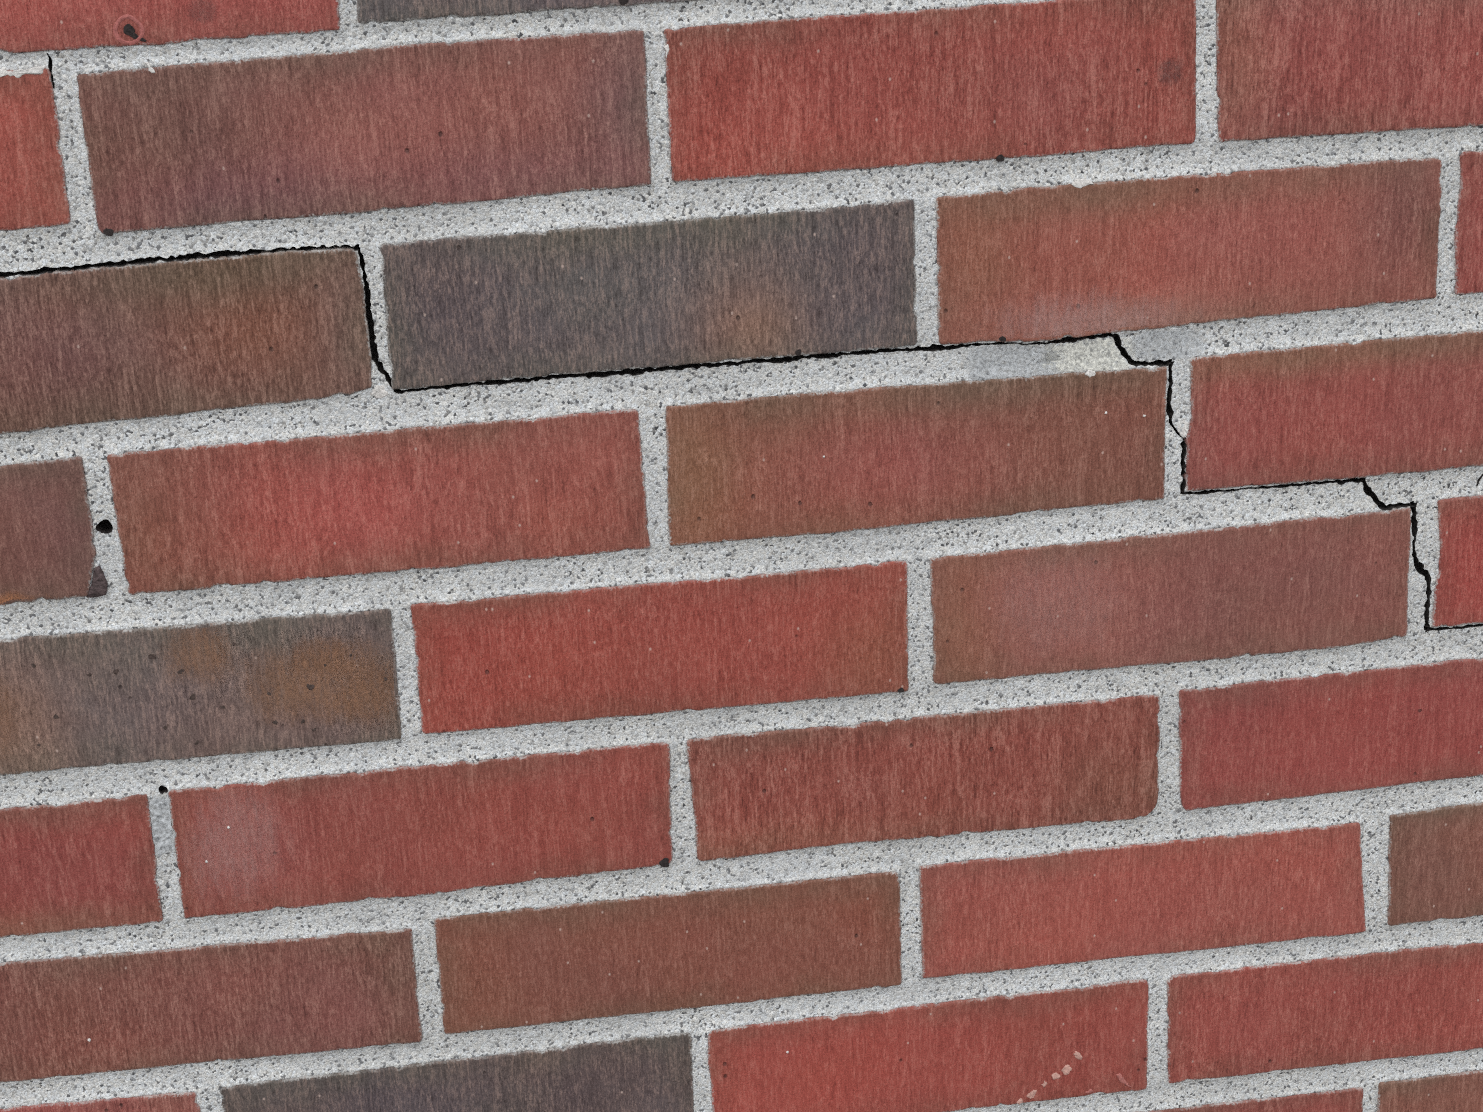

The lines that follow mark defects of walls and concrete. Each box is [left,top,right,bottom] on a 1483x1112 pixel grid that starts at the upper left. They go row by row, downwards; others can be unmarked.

crack [0,244,1483,633]